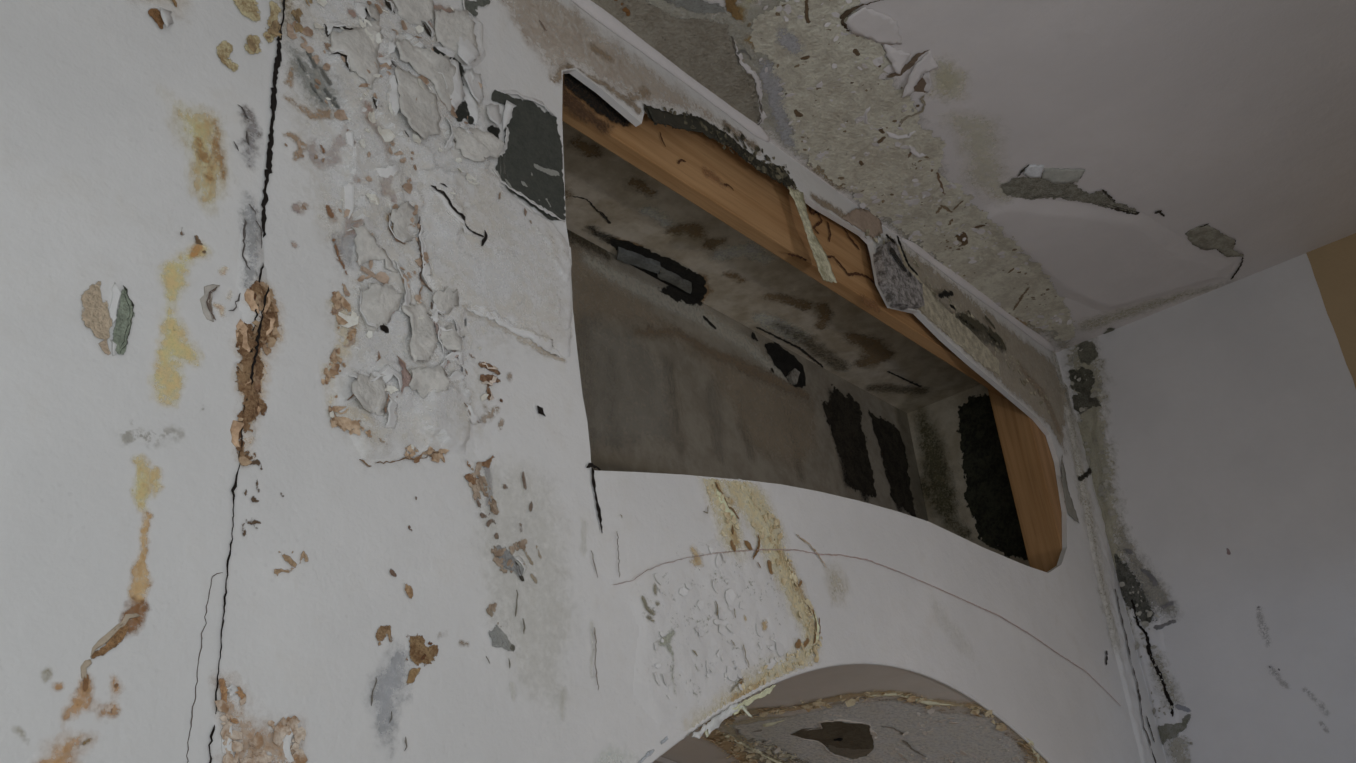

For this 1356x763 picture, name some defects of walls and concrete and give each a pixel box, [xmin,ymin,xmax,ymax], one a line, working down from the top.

crack [250,0,285,353]
flaking render [1001,164,1165,217]
flaking render [81,281,135,356]
peeling [323,0,1076,567]
peeling [1185,224,1244,279]
crack [186,398,248,763]
flaking render [791,717,875,761]